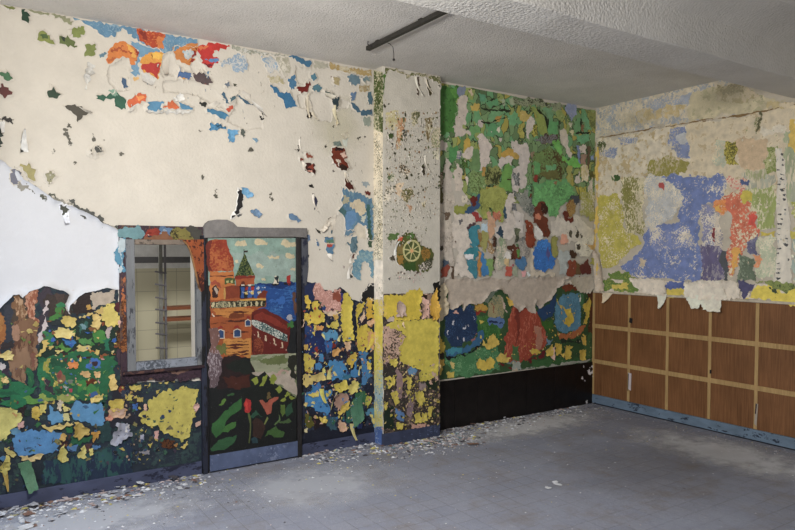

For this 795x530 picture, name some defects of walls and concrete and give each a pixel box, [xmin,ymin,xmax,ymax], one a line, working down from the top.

crack [599,104,795,138]
peeling [0,4,613,494]
peeling [629,273,667,309]
peeling [683,271,740,312]